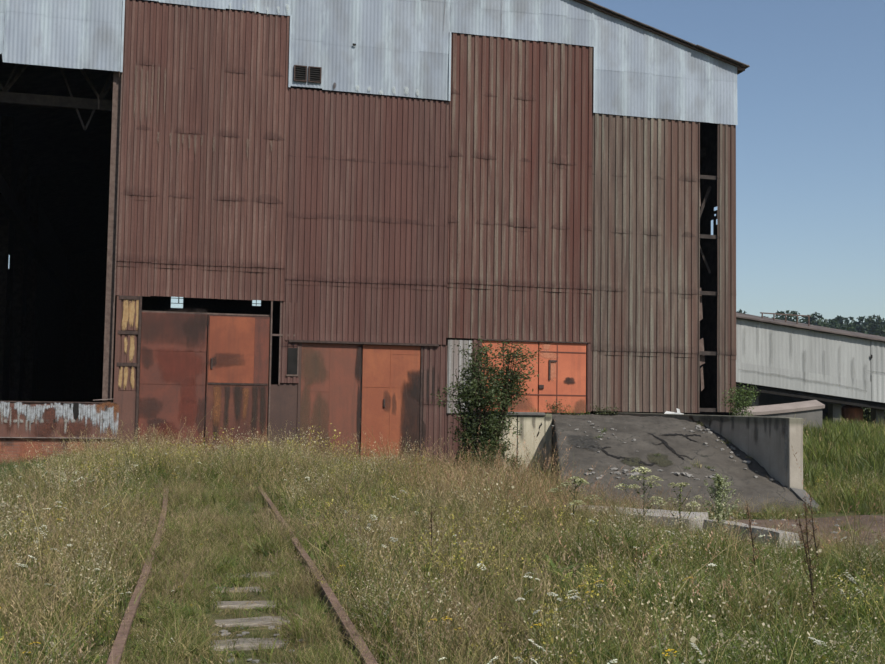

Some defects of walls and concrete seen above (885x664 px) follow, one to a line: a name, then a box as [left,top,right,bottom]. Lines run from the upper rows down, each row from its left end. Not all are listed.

rust [7,406,17,430]
peeling [0,402,119,451]
rust [35,408,89,436]
crack [592,433,701,466]